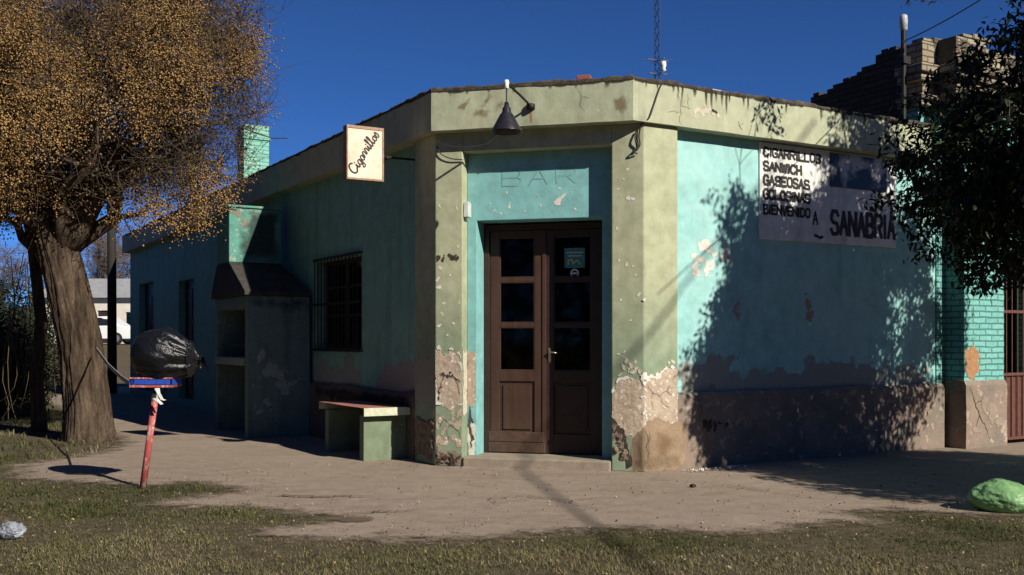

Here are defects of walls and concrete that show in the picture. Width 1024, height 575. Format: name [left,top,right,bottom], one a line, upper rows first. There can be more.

leakage [550,79,804,110]
peeling [691,238,734,279]
peeling [376,301,476,466]
crack [438,374,475,448]
peeling [612,351,932,468]
peeling [965,345,981,380]